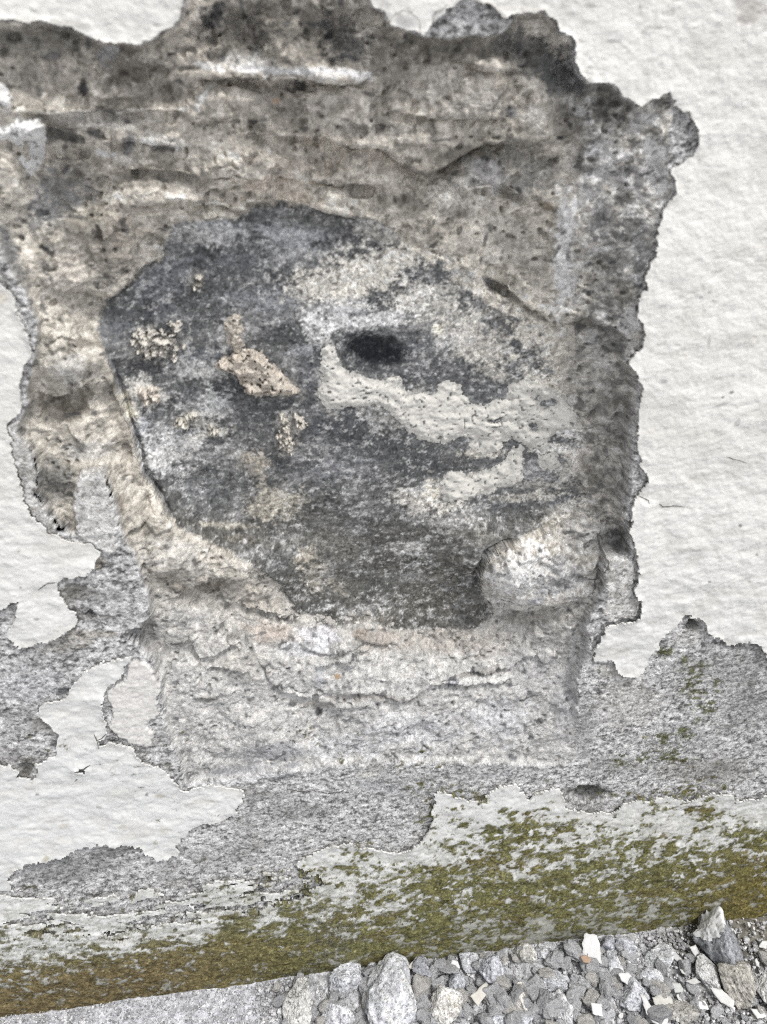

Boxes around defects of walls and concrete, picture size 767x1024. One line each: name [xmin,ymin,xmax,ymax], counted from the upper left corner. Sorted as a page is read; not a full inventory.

spalling [0,0,767,813]
peeling [0,756,574,936]
leakage [0,884,346,1017]
peeling [580,933,602,965]
peeling [674,945,700,961]
peeling [470,982,488,1006]
peeling [686,977,734,1010]